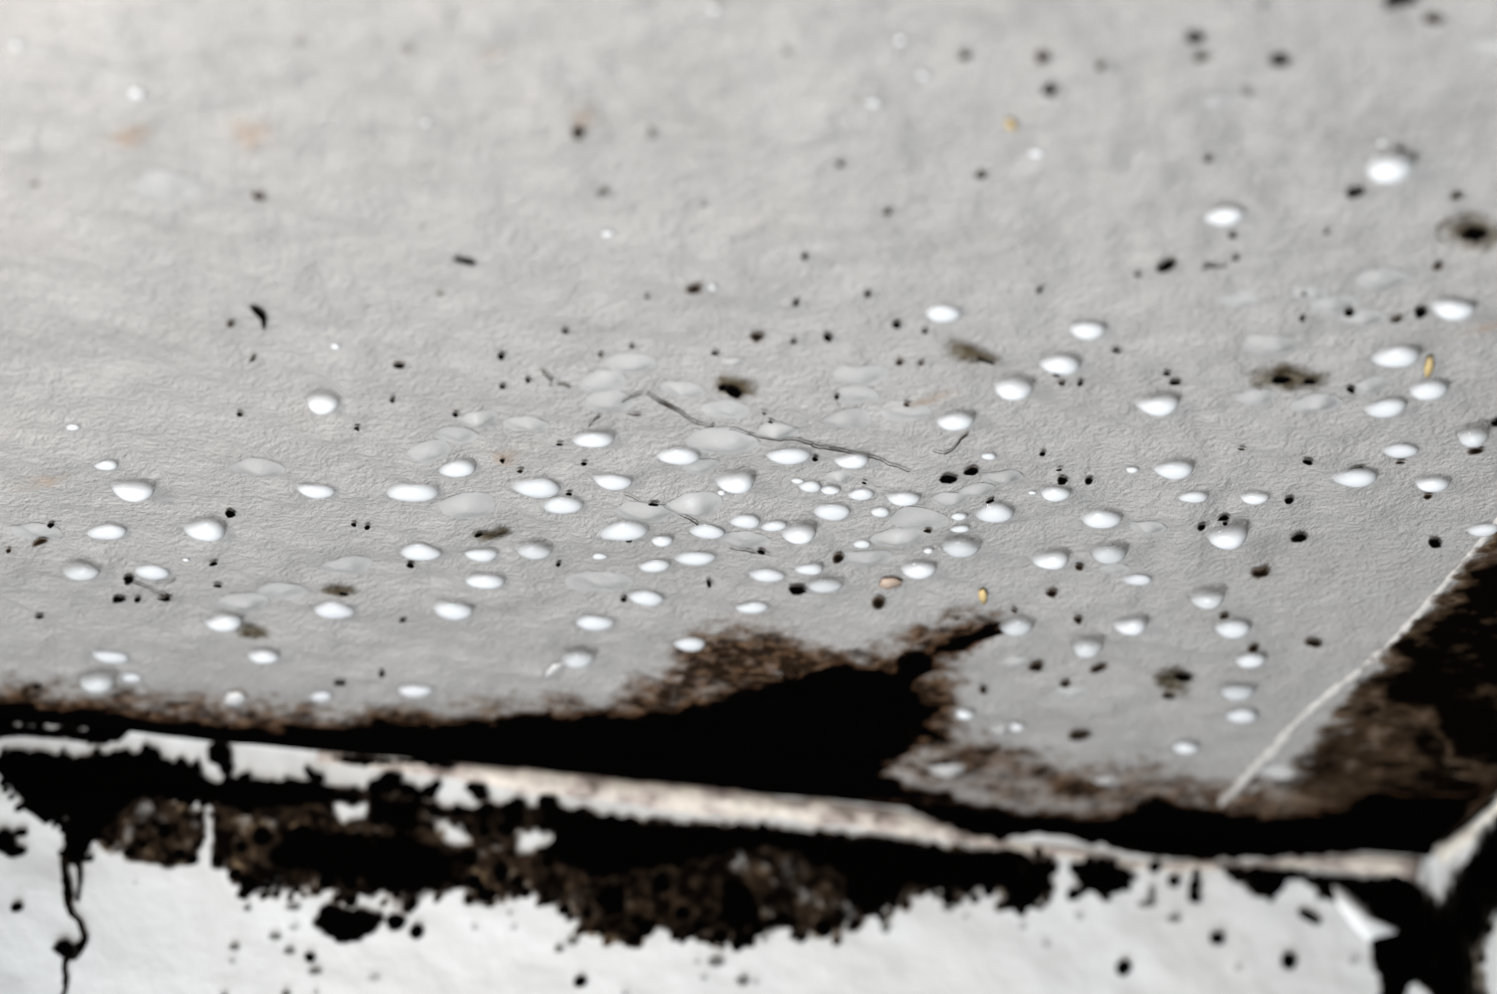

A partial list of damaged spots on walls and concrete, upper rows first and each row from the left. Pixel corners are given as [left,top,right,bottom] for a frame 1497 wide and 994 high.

mould [939,467,979,484]
mould [1039,452,1093,485]
mould [32,523,55,547]
mould [474,527,509,542]
mould [1197,515,1230,531]
water stain [0,532,1497,994]